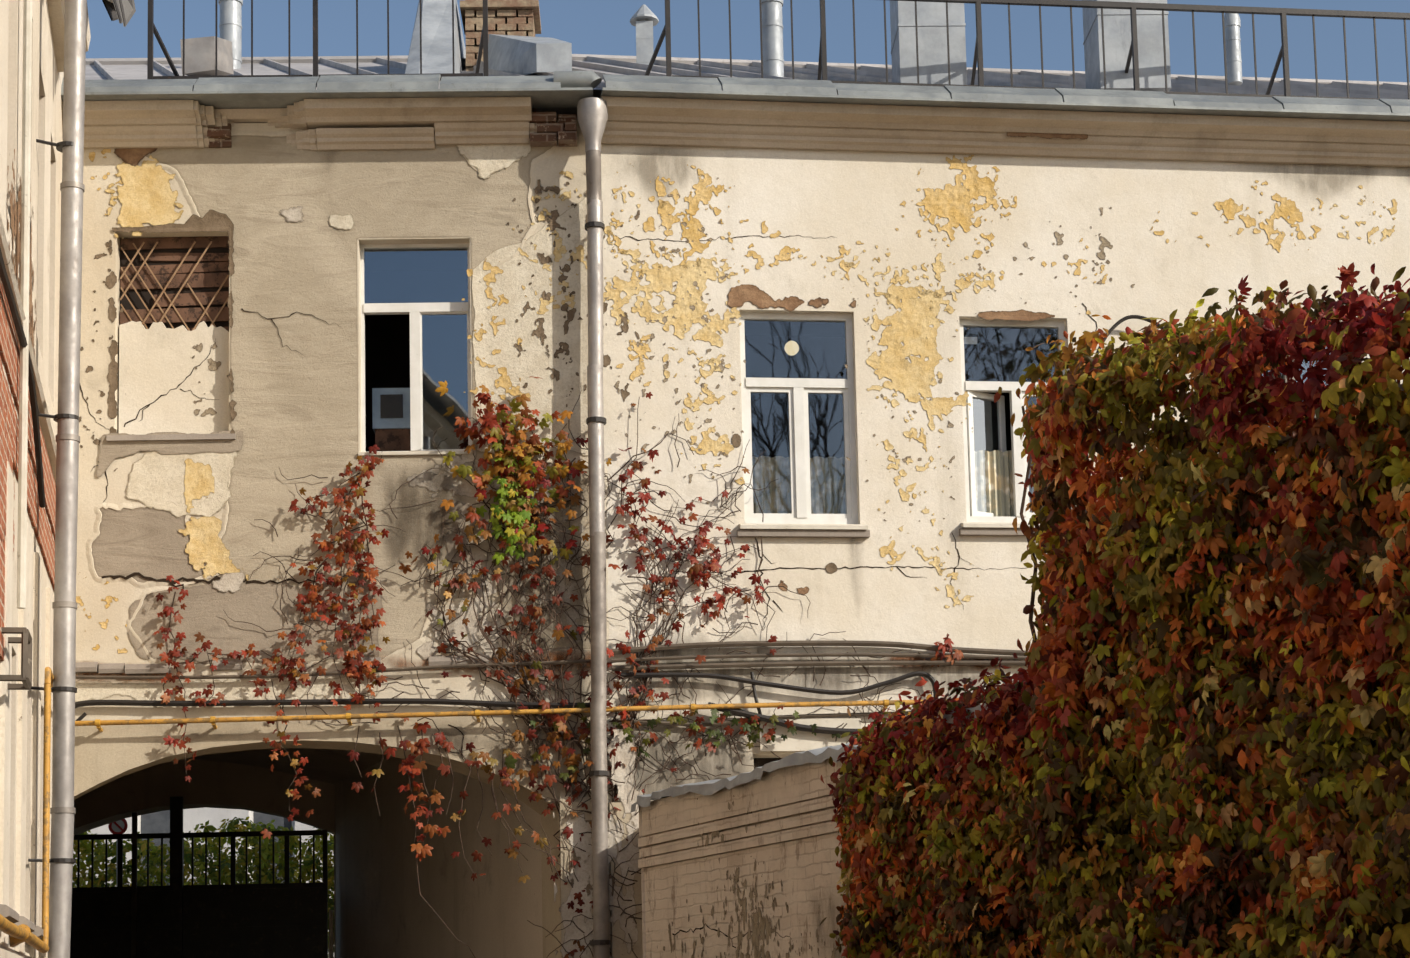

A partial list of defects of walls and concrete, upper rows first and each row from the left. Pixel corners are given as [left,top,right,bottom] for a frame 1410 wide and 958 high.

peeling [1214,180,1398,252]
crack [241,309,339,355]
crack [80,339,217,430]
flaking render [75,129,1113,708]
crack [101,572,328,589]
crack [735,533,1023,630]
peeling [504,720,645,958]
peeling [657,795,846,958]